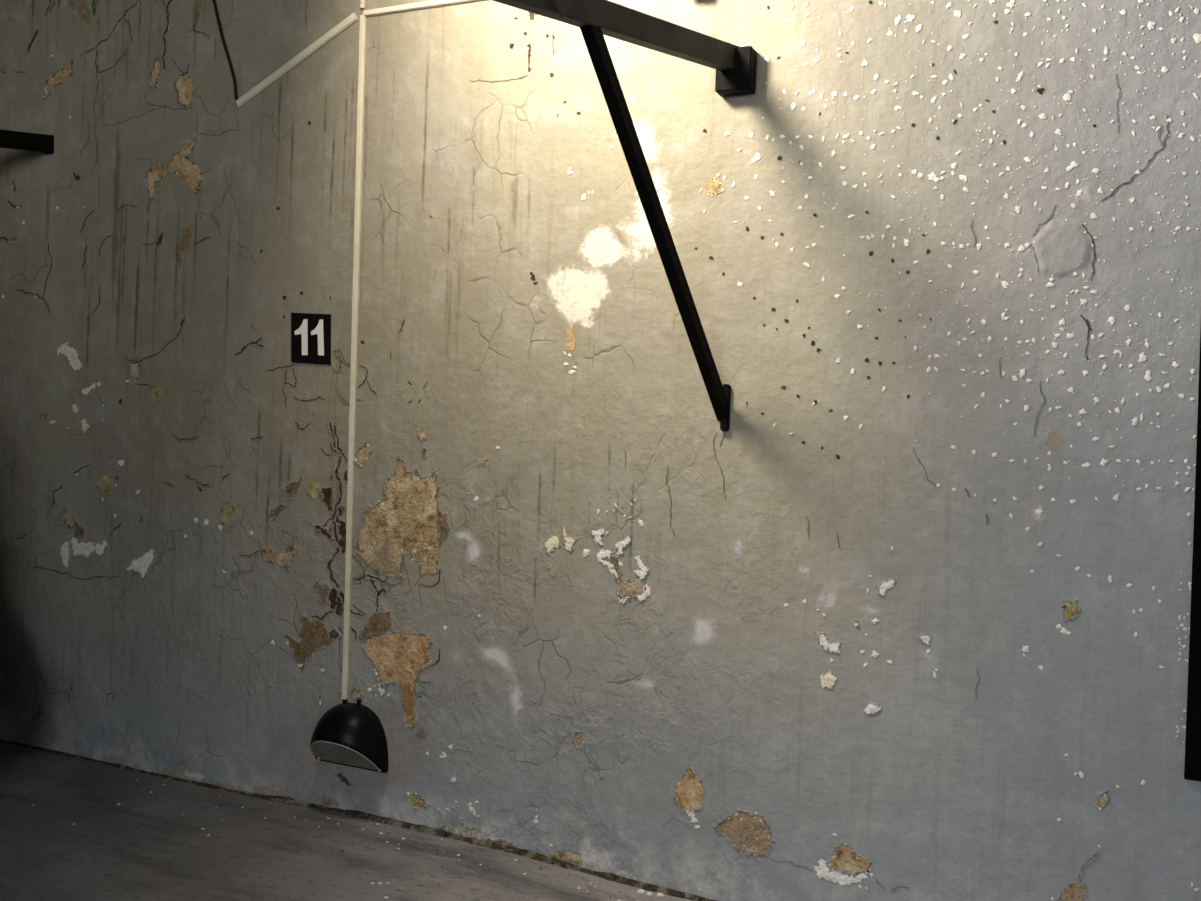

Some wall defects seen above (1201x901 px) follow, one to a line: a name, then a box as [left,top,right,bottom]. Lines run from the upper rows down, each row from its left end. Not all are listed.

crack [80,0,241,166]
peeling [145,138,205,203]
damp [628,96,674,240]
damp [530,191,656,328]
crack [164,472,232,493]
crack [234,319,405,640]
peeling [268,427,451,581]
peeling [543,499,651,604]
peeling [270,579,345,672]
peeling [349,607,433,729]
peeling [673,766,776,859]
peeling [814,833,873,890]